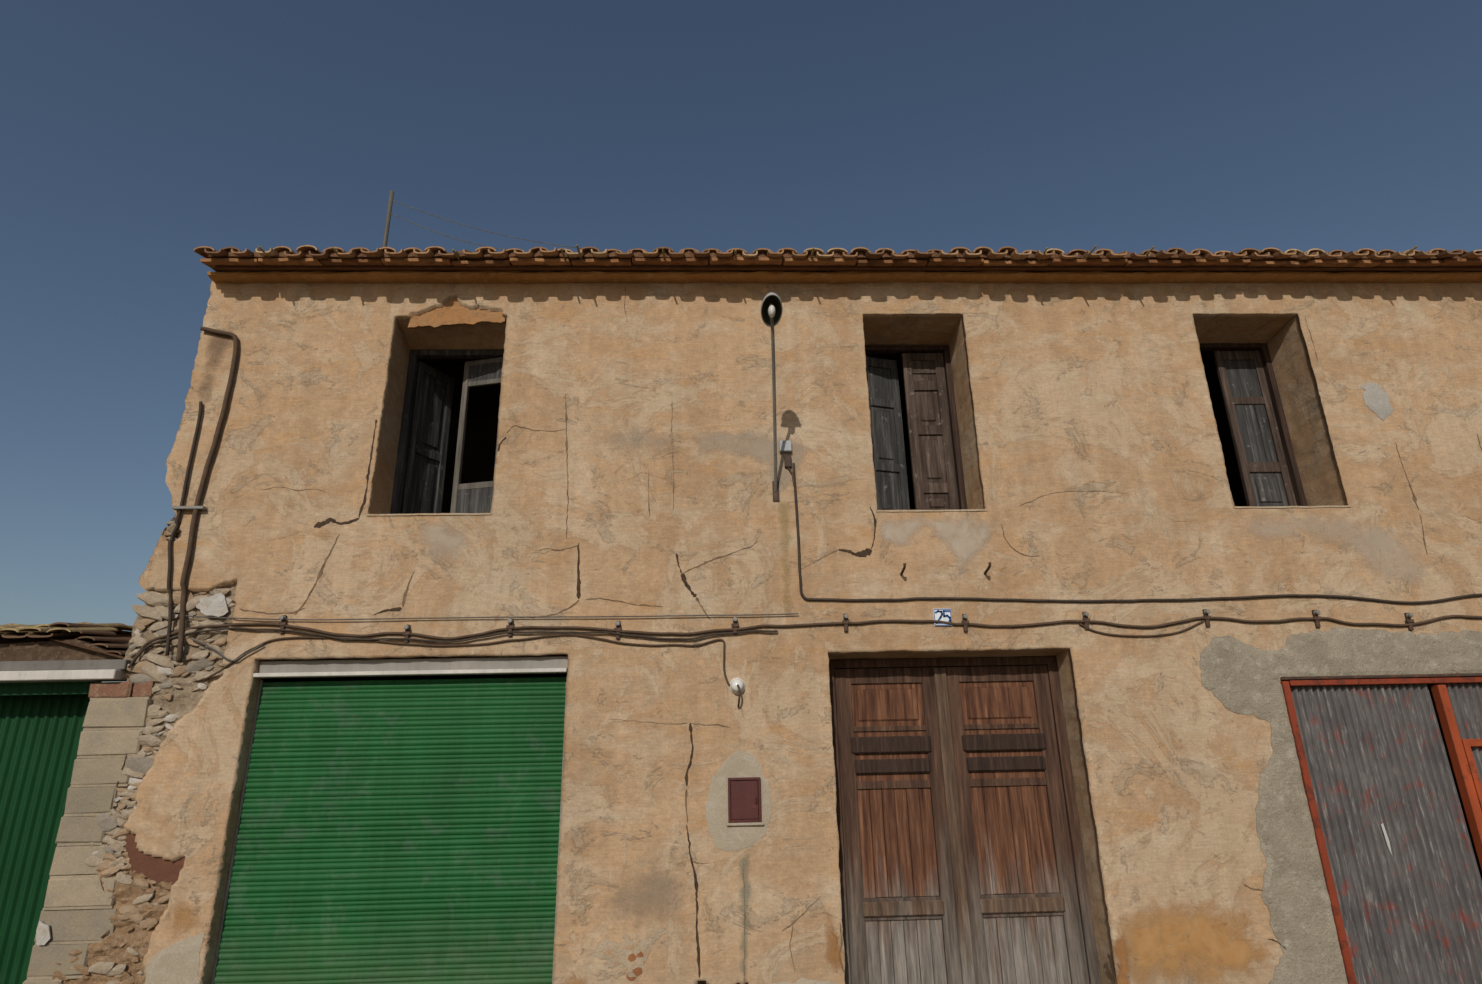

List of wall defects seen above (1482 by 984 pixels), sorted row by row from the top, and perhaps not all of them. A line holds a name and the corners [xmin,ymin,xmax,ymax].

crack [240,419,377,615]
crack [374,571,414,615]
crack [497,394,758,620]
crack [802,507,877,569]
spalling [84,583,237,884]
crack [611,719,730,977]
crack [740,864,748,982]
crack [782,896,821,970]